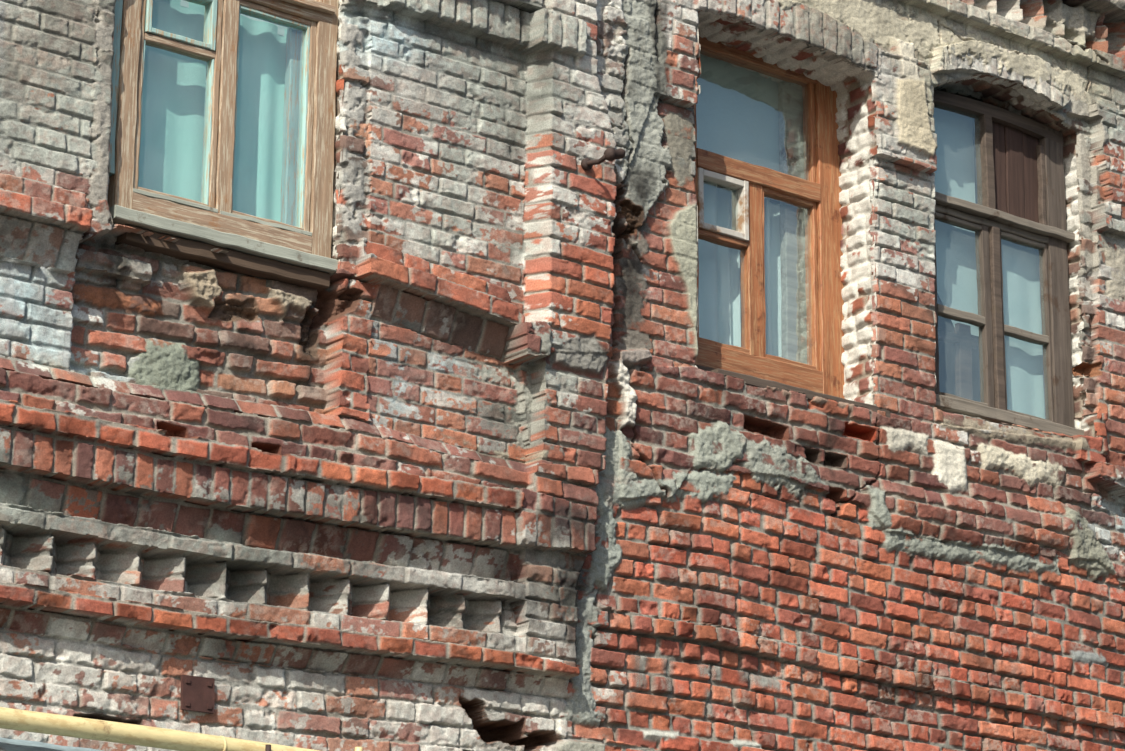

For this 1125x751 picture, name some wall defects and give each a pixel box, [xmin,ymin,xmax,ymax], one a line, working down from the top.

spalling [1044,0,1114,41]
crack [611,45,645,360]
spalling [156,420,201,440]
spalling [250,440,293,456]
crack [831,417,883,518]
spalling [73,711,145,726]